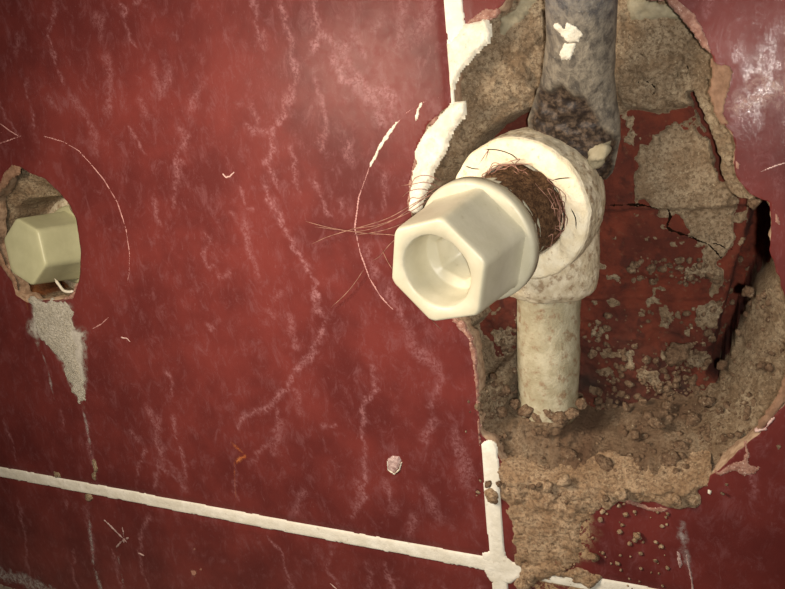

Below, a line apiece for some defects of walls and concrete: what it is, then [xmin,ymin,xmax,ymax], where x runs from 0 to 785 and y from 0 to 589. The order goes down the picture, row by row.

spalling [421,0,546,210]
spalling [0,165,73,235]
spalling [452,0,785,498]
crack [607,203,732,259]
spalling [41,279,78,300]
spalling [598,495,667,512]